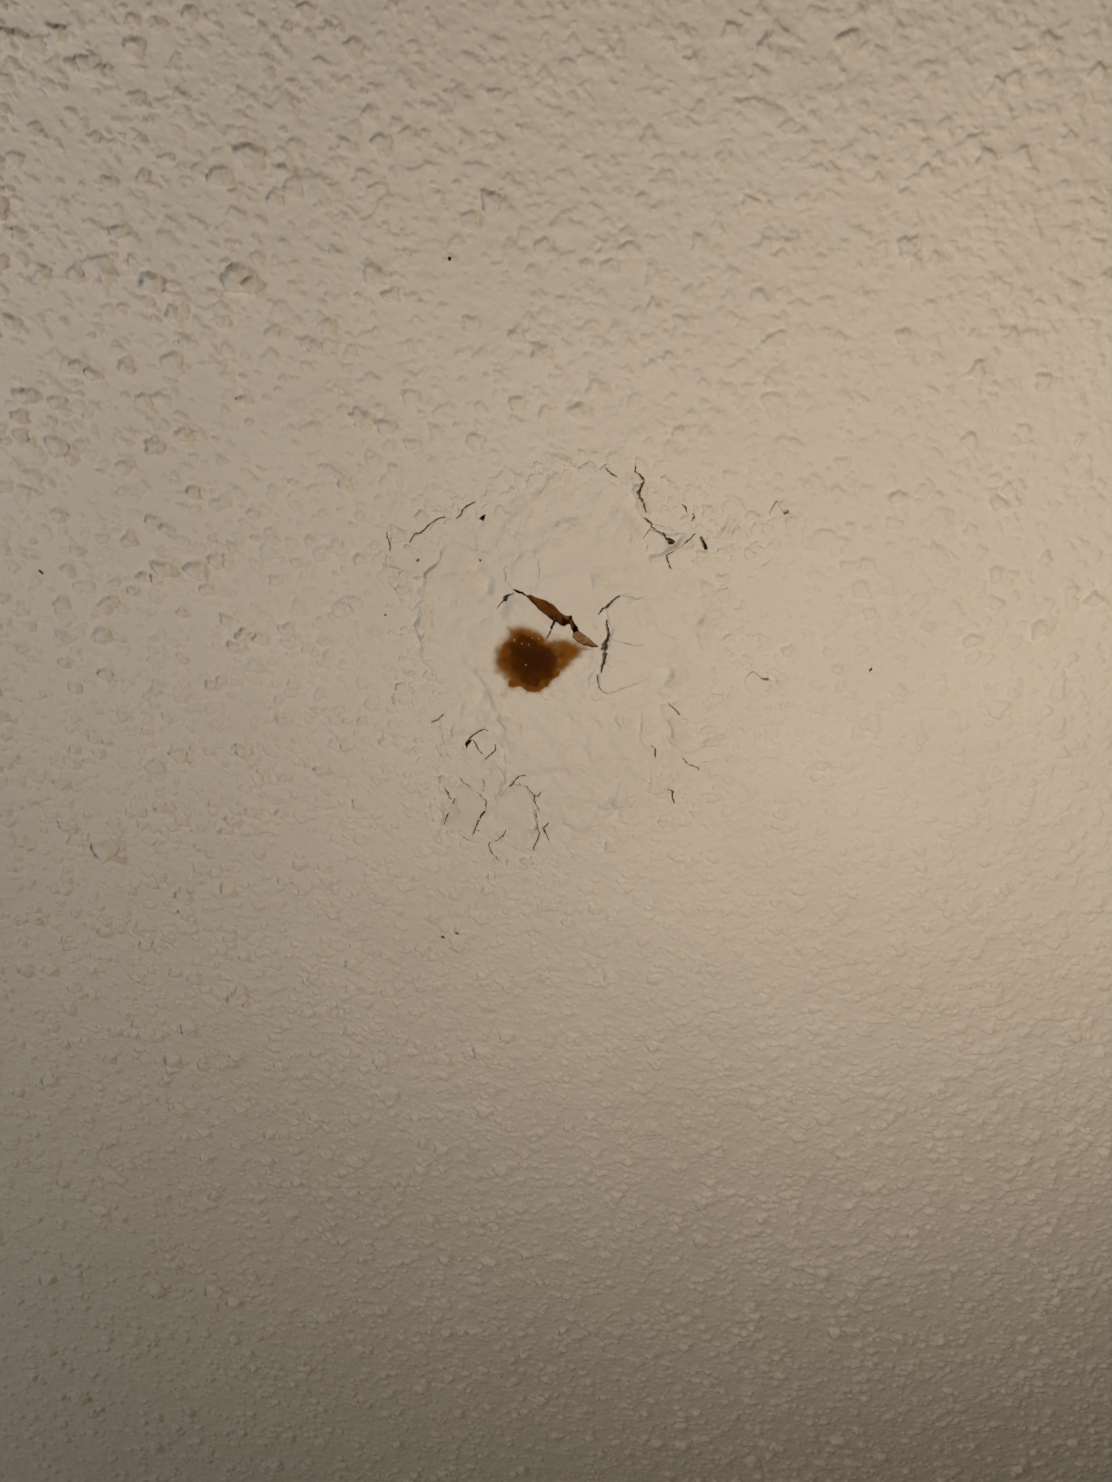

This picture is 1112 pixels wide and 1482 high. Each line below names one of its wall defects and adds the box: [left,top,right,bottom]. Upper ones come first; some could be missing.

crack [386,501,475,551]
crack [606,466,695,569]
crack [497,558,647,694]
crack [431,714,496,759]
crack [651,745,699,803]